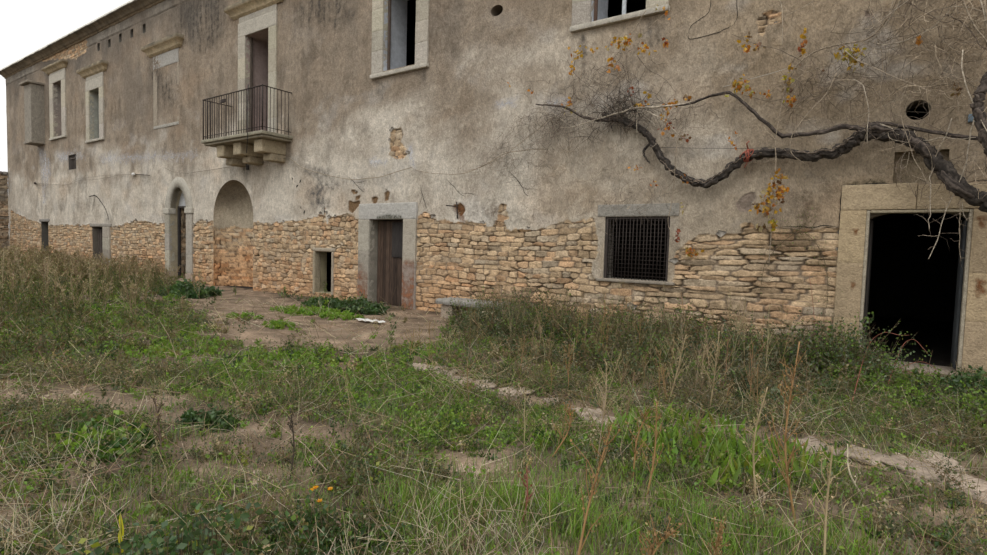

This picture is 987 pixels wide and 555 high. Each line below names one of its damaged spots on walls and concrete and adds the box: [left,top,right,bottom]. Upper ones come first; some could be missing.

spalling [388,126,410,160]
spalling [192,189,360,301]
spalling [416,192,839,347]